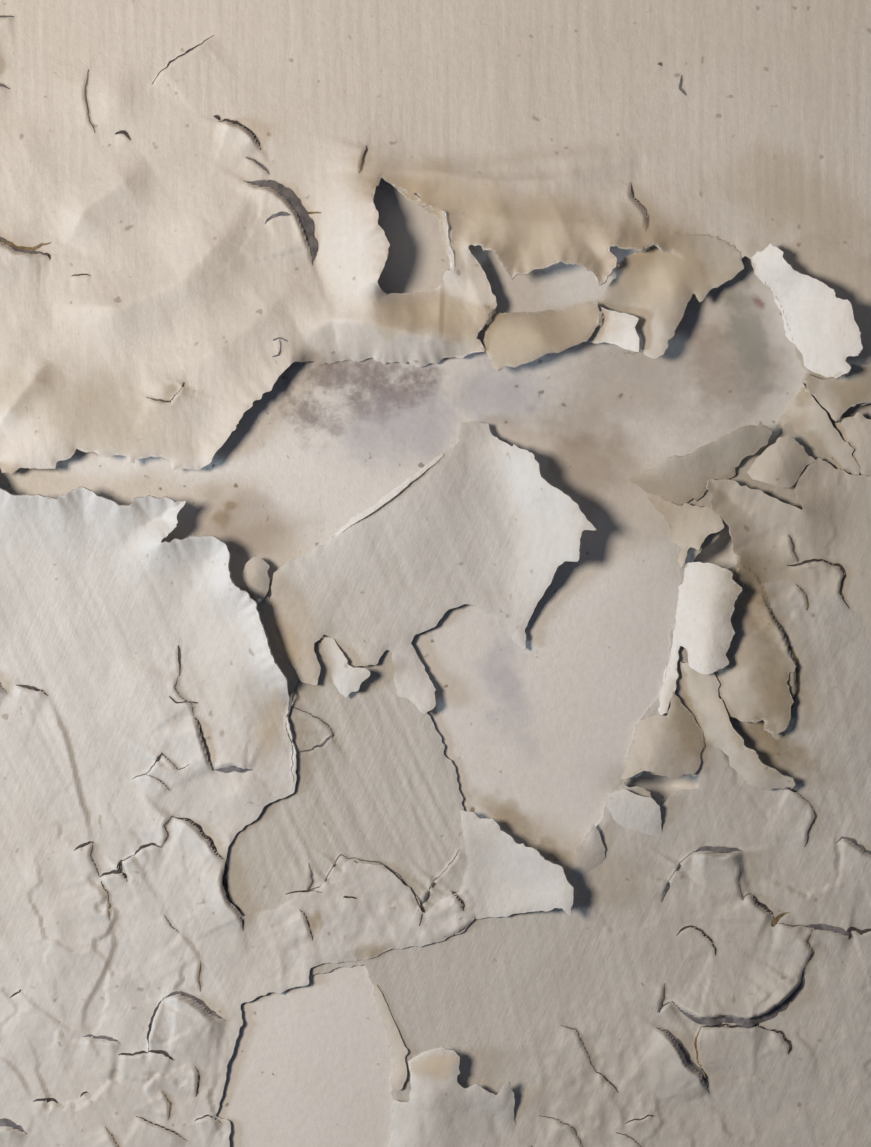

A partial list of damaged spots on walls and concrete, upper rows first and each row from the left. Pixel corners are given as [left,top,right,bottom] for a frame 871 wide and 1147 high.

crack [0,237,51,259]
crack [213,115,321,265]
water stain [394,173,611,268]
water stain [488,315,592,353]
water stain [628,233,703,297]
peeling [0,118,871,836]
crack [74,645,252,929]
crack [286,849,475,940]
peeling [448,809,605,920]
crack [656,846,871,1093]
crack [82,961,226,1141]
peeling [373,985,516,1147]